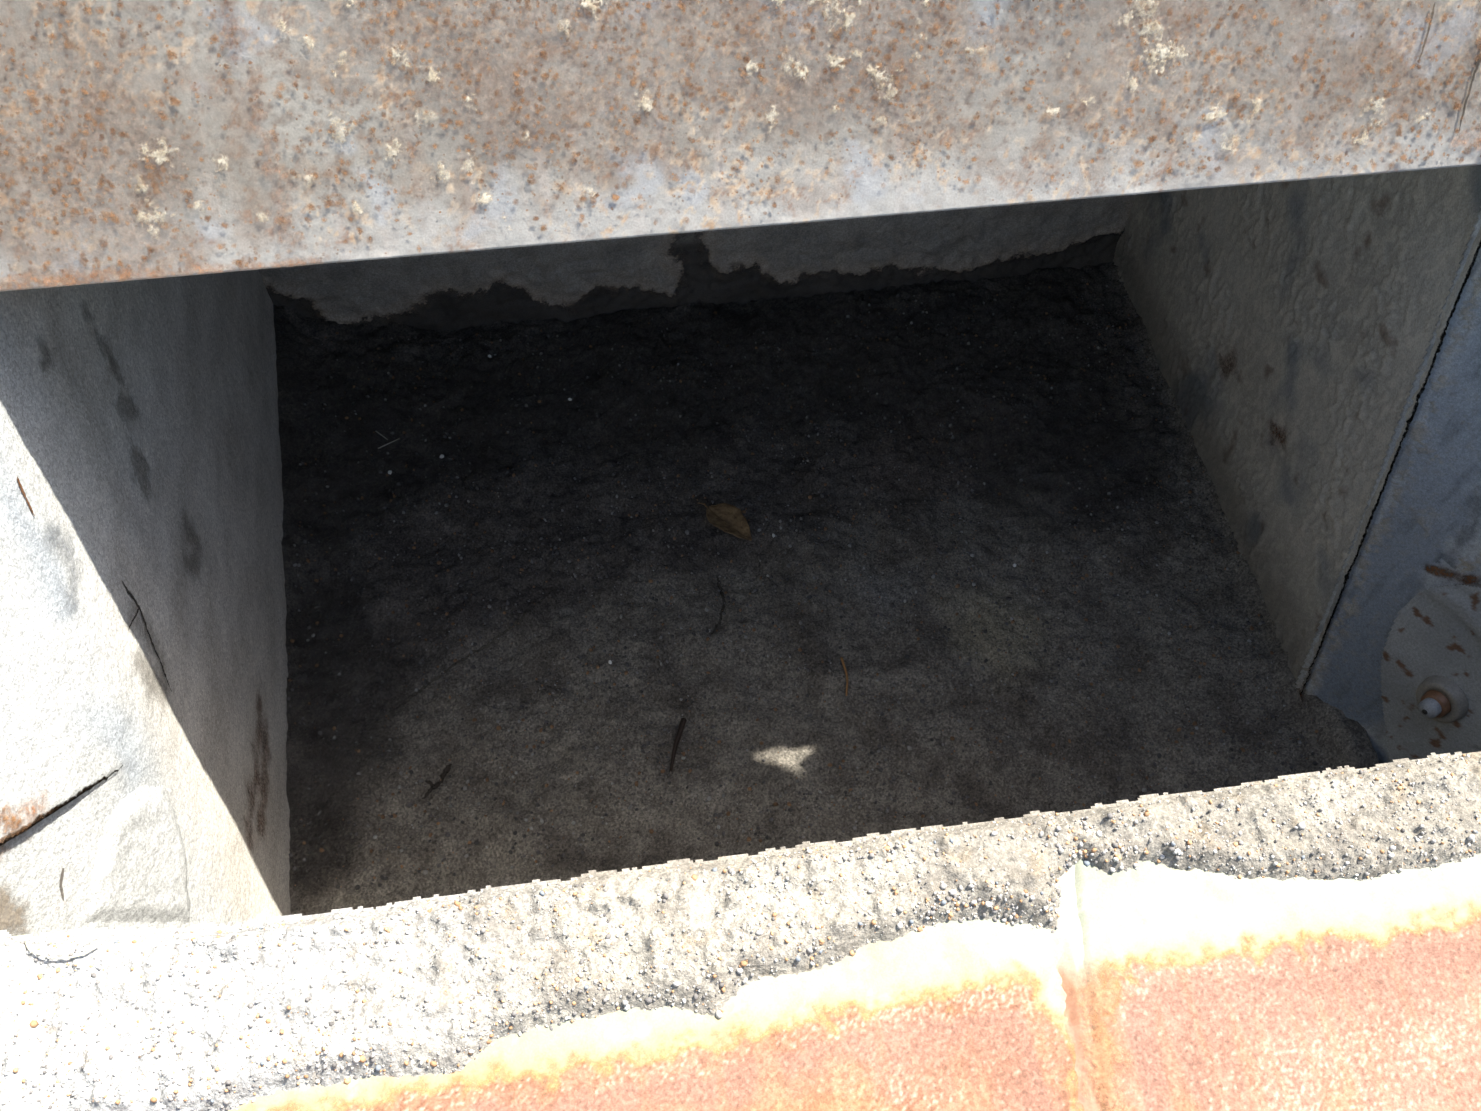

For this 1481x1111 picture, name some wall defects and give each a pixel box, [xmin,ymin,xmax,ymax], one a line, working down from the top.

peeling [827,50,897,97]
crack [1457,55,1481,135]
peeling [142,140,177,167]
rust [0,264,223,290]
rust [0,805,36,837]
crack [0,764,123,846]
crack [58,868,66,900]
rust [326,906,1481,1111]